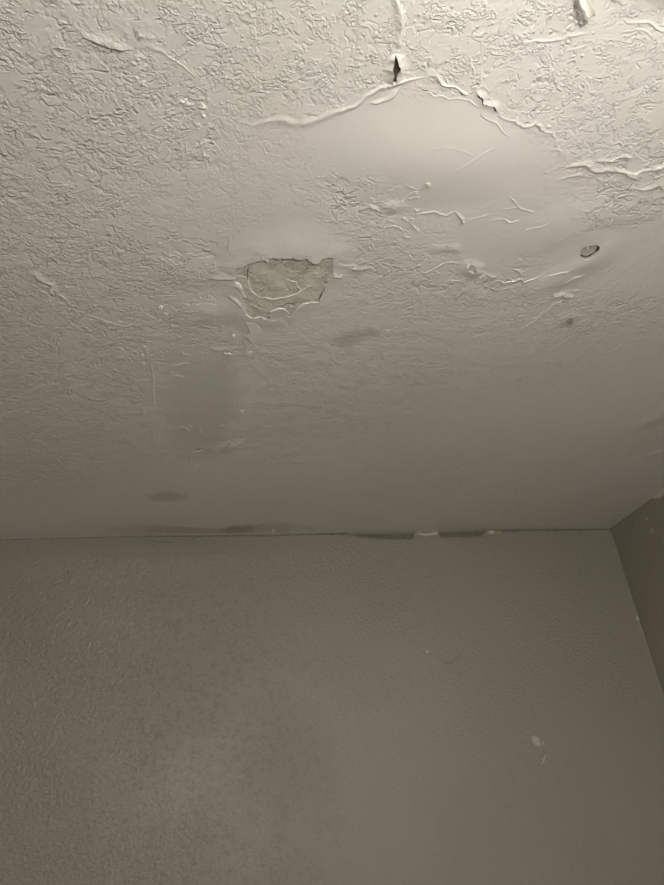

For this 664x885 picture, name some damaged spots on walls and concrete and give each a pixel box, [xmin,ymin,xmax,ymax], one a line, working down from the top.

crack [247,0,664,192]